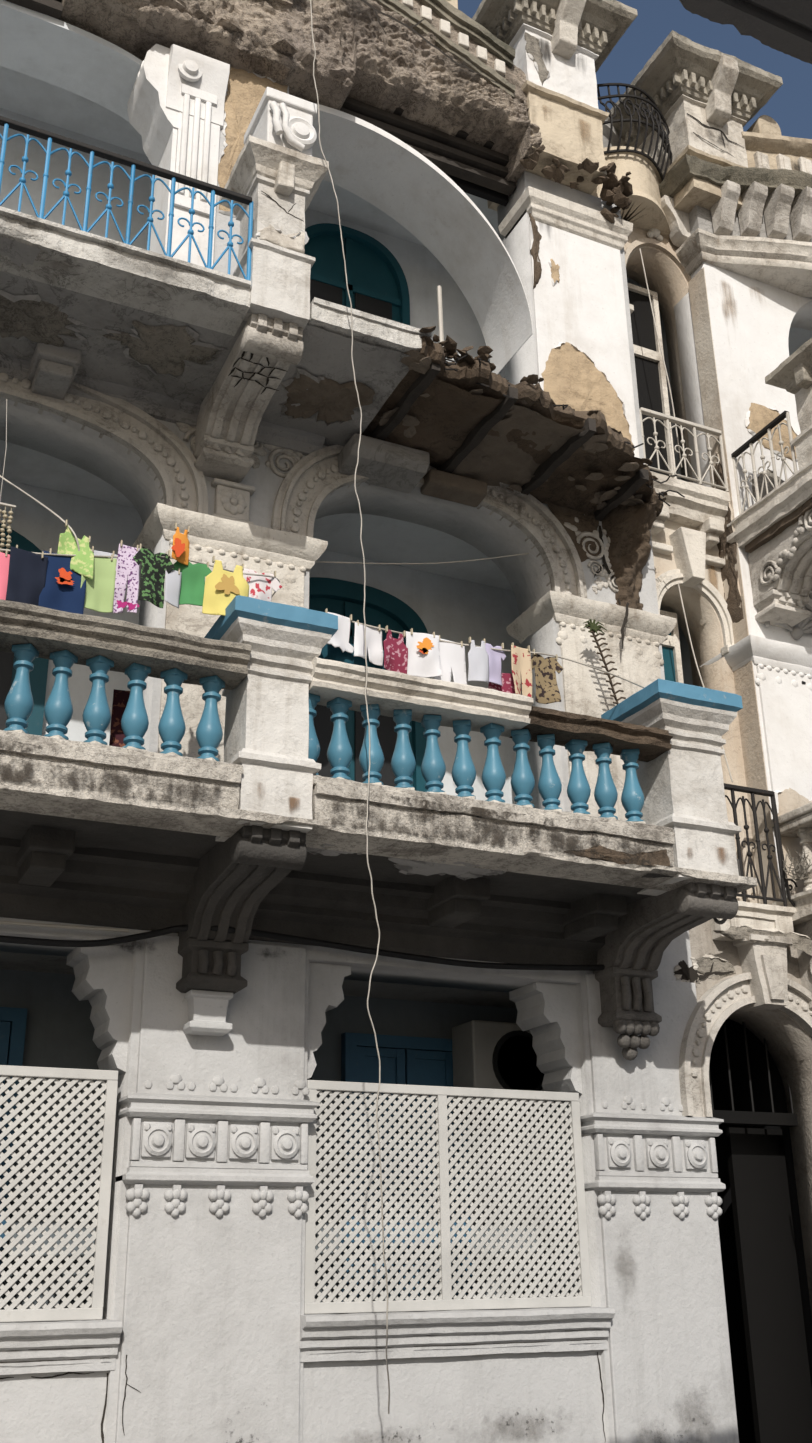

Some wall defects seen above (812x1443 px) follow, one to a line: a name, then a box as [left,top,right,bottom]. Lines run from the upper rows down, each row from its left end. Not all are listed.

flaking render [524,32,550,85]
flaking render [218,67,288,217]
crack [687,113,744,157]
flaking render [279,370,375,427]
spalling [541,342,644,451]
spalling [745,403,798,504]
flaking render [544,502,601,562]
flaking render [711,452,744,623]
leakage [0,742,221,809]
crack [0,1347,141,1443]
crack [310,1329,606,1441]